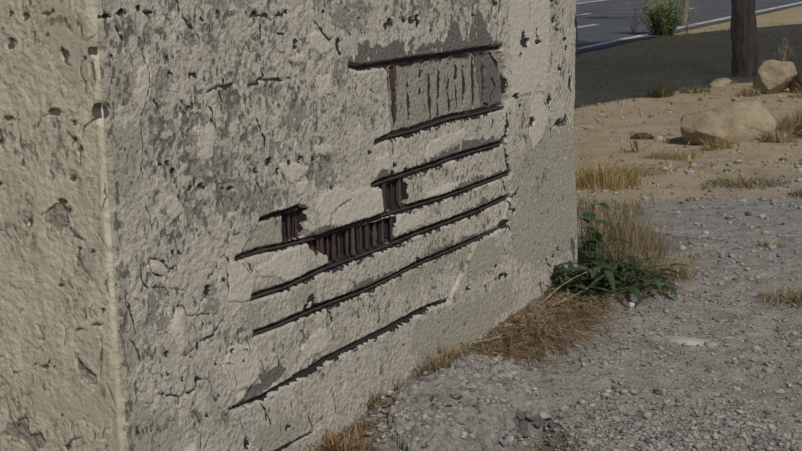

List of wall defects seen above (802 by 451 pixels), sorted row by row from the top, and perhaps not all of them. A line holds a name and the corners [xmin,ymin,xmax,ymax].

spalling [0,26,49,49]
peeling [9,0,82,27]
crack [180,12,362,118]
crack [19,102,51,167]
spalling [0,192,108,336]
crack [64,0,263,362]
spalling [99,0,575,451]
corrosion [234,172,508,260]
corrosion [250,197,507,336]
corrosion [374,106,504,144]
spalling [0,344,107,451]
crack [161,338,282,448]